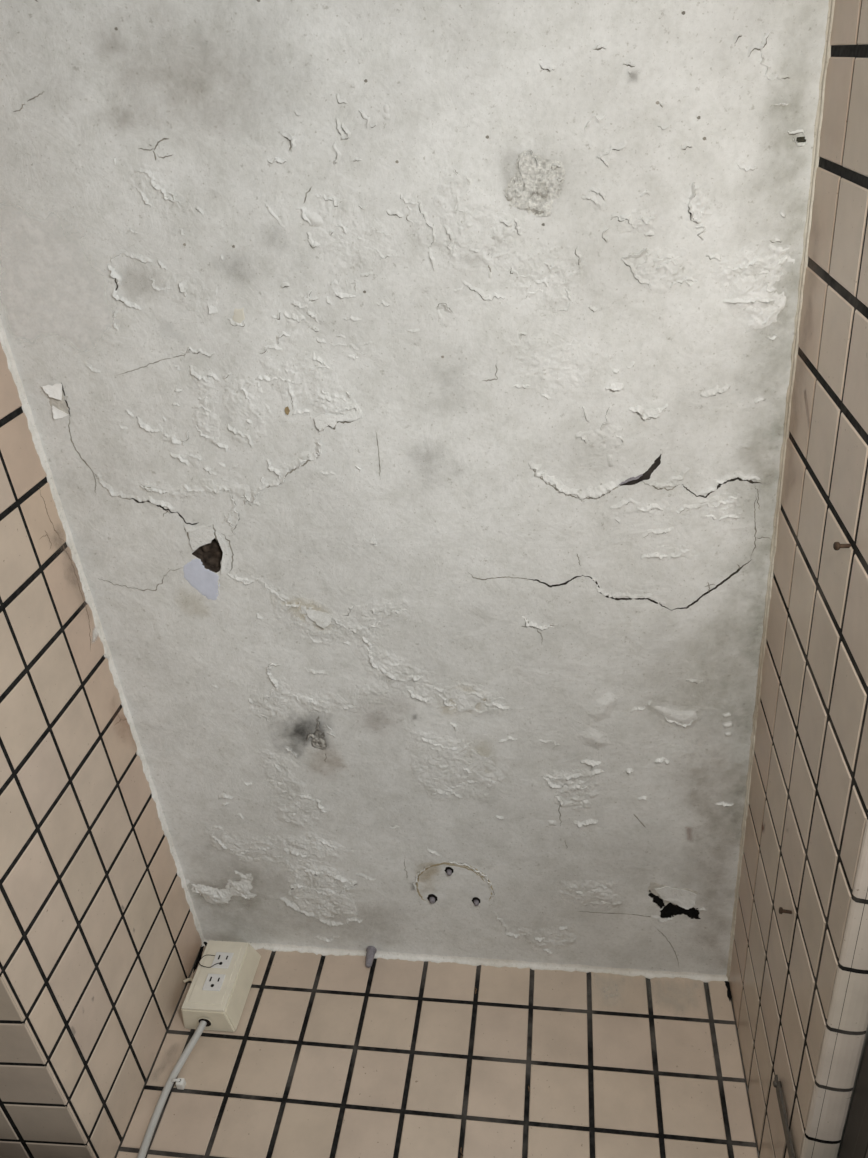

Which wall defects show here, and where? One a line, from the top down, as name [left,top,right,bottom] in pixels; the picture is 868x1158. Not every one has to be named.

spalling [505,150,566,217]
peeling [685,182,714,245]
peeling [107,249,154,331]
peeling [41,383,70,419]
crack [68,415,197,525]
peeling [183,282,373,646]
crack [469,455,771,610]
crack [39,488,180,648]
water stain [296,716,335,763]
spalling [185,870,258,906]
spalling [647,882,708,923]